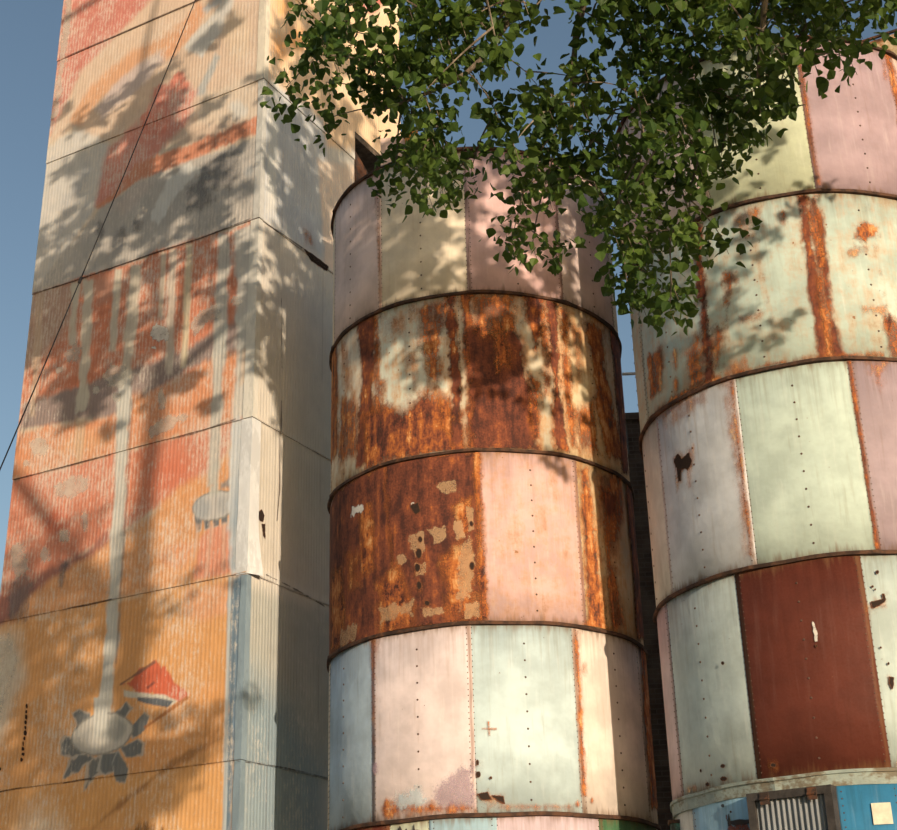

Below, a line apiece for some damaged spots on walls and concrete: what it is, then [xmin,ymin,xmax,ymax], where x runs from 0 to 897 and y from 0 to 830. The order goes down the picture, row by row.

rust [799,65,820,184]
rust [886,55,897,104]
rust [647,347,663,398]
rust [657,222,722,419]
rust [721,273,736,304]
rust [730,360,746,482]
rust [797,195,897,549]
rust [329,294,658,810]
rust [383,799,469,818]